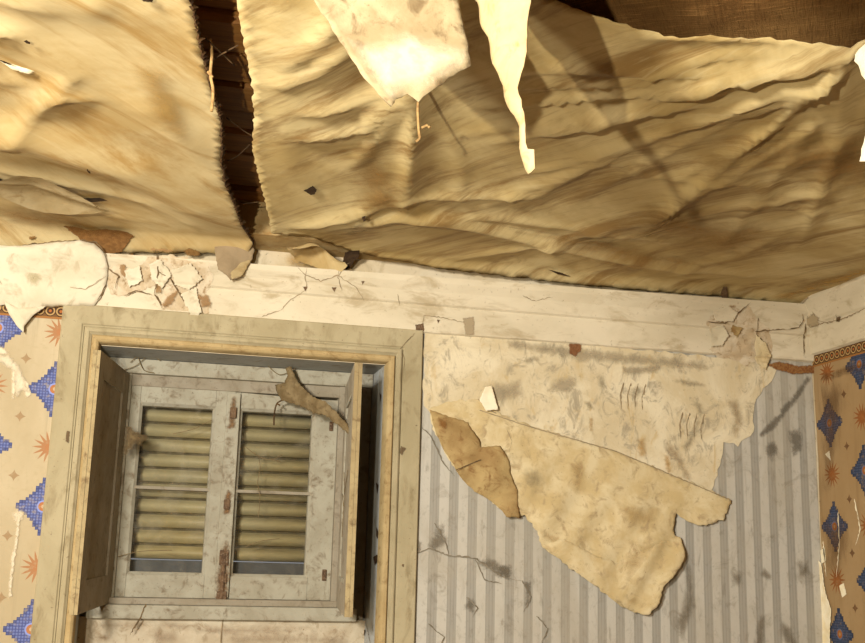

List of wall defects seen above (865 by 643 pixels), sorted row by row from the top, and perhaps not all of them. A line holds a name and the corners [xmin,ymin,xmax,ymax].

flaking render [0,239,213,333]
leakage [493,386,516,399]
leakage [537,348,691,373]
leakage [417,523,532,612]